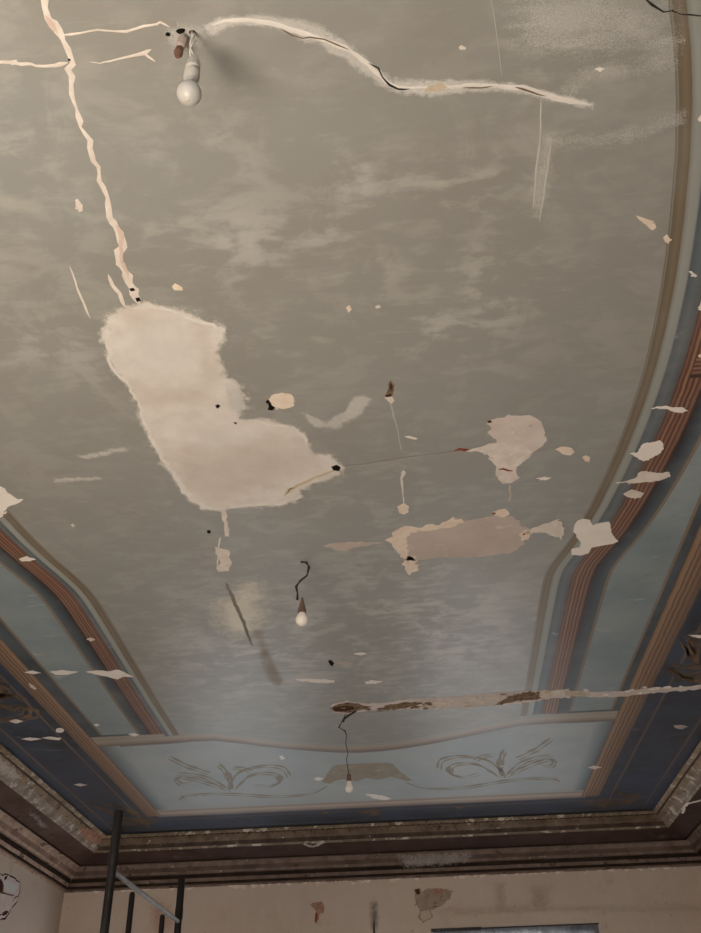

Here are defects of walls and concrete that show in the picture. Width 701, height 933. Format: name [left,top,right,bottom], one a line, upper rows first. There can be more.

crack [646,0,701,17]
crack [205,0,594,110]
crack [0,0,169,307]
spalling [266,393,295,410]
spalling [616,440,670,499]
spalling [0,486,23,517]
spalling [524,519,618,556]
crack [330,685,701,714]
spalling [0,873,20,920]
spalling [388,851,471,923]